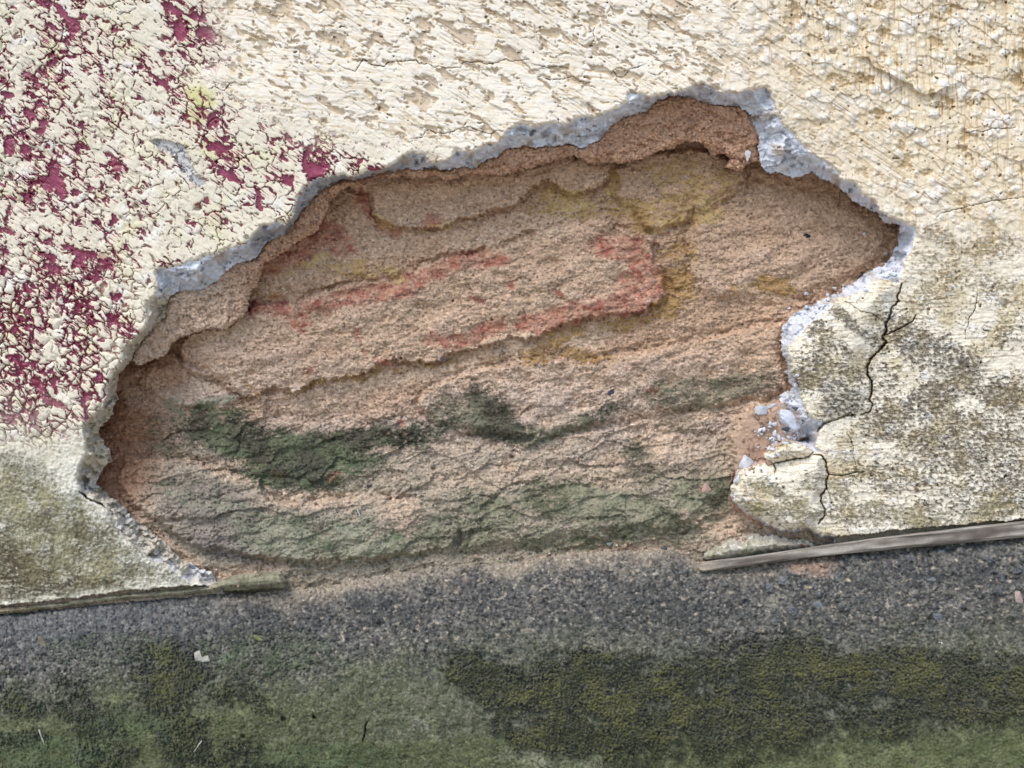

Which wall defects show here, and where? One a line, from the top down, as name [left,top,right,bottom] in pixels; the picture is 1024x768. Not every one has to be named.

peeling [0,0,128,237]
peeling [133,0,263,189]
flaking render [0,84,1024,615]